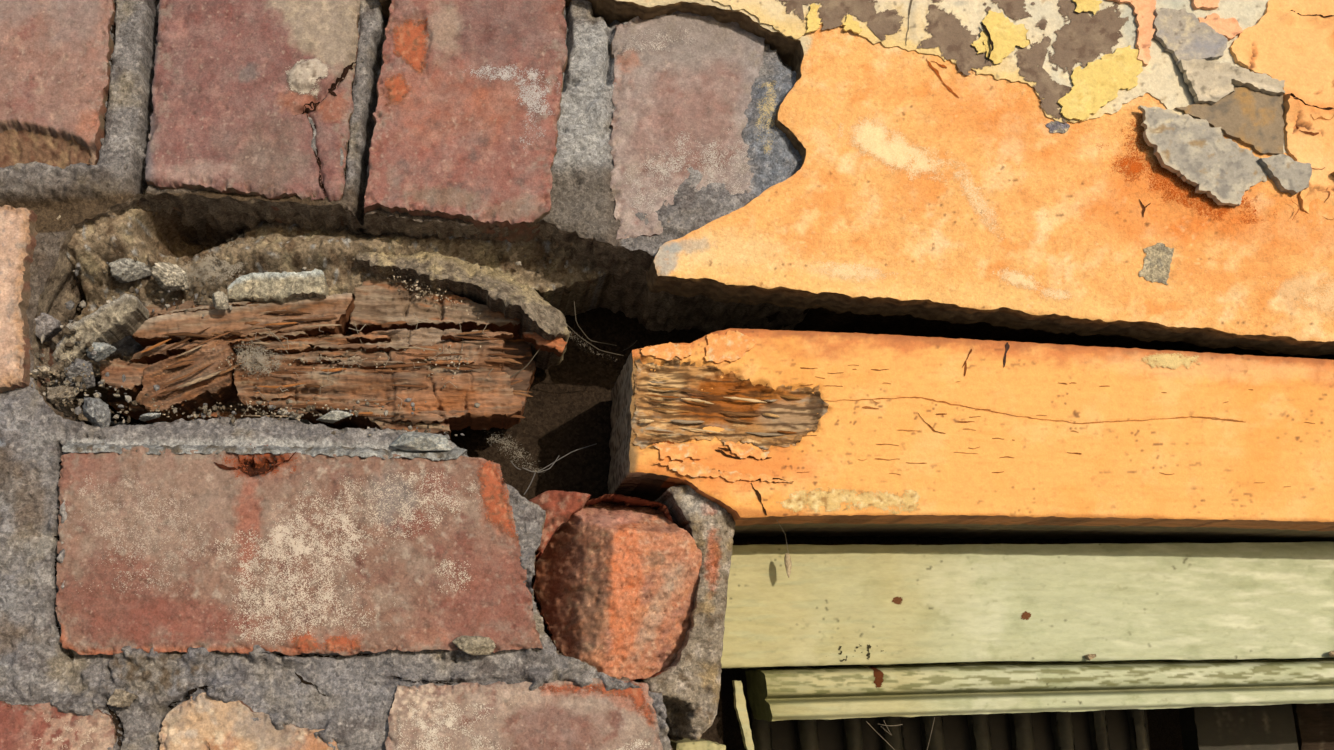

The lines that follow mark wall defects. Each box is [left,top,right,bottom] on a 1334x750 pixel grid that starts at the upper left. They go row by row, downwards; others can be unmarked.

crack [295,62,356,193]
peeling [712,0,1334,220]
crack [1290,93,1334,136]
peeling [1139,243,1174,285]
peeling [640,330,757,364]
crack [1002,342,1010,367]
crack [799,349,1253,475]
peeling [652,441,795,483]